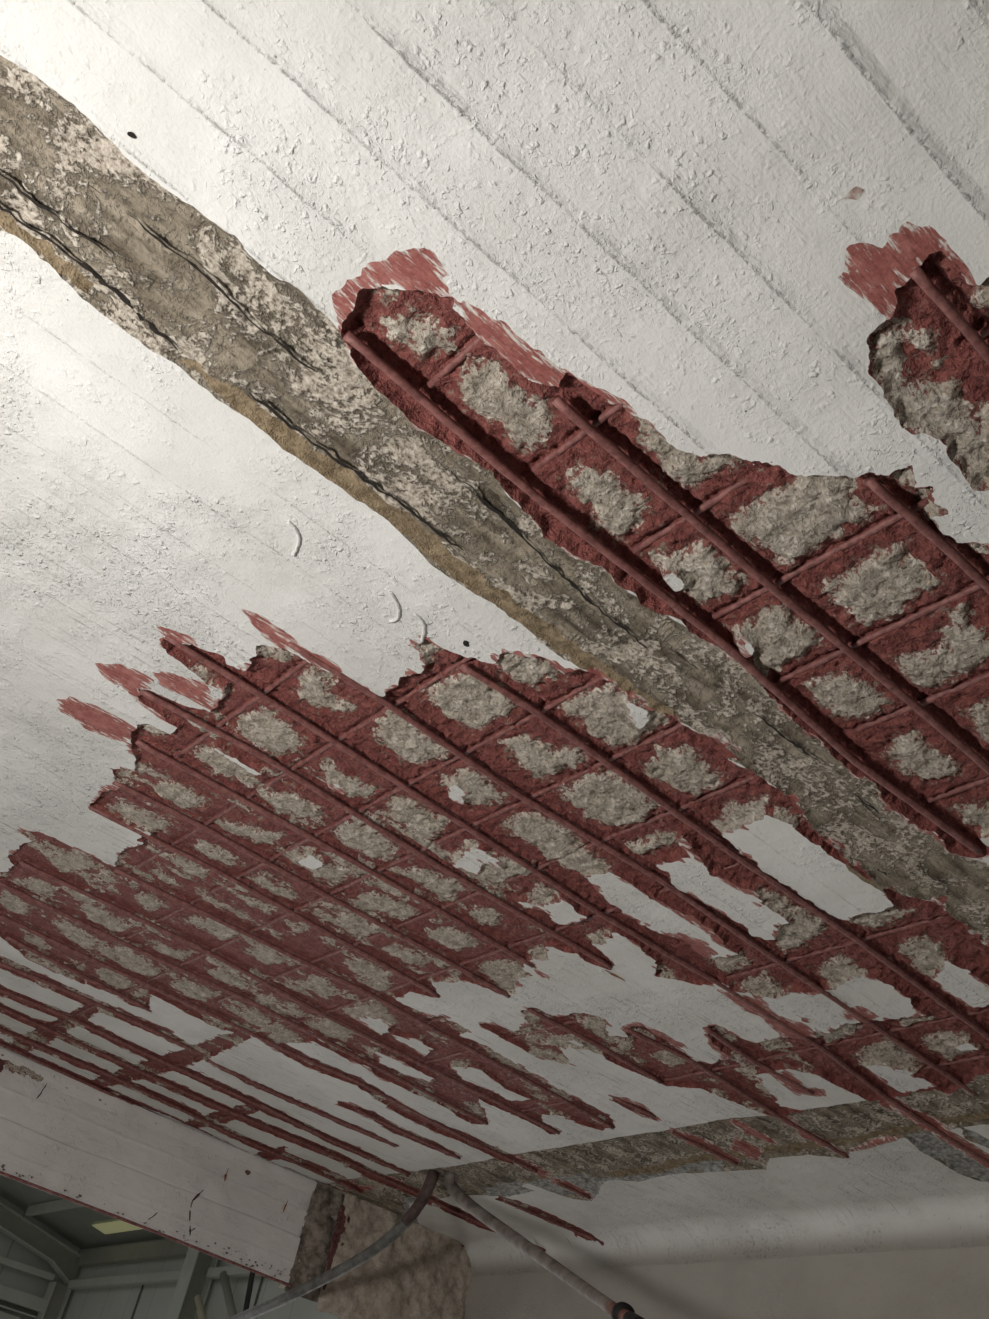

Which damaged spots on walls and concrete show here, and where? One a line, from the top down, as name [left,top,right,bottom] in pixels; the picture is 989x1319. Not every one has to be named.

peeling [0,55,989,1033]
spalling [0,609,989,1233]